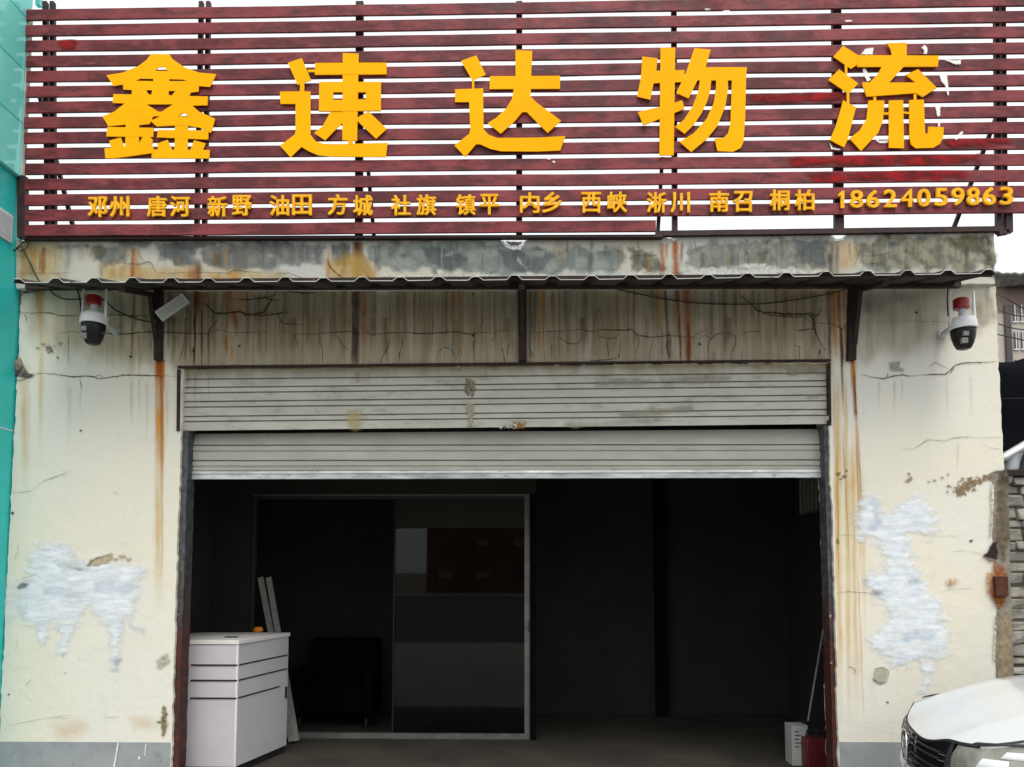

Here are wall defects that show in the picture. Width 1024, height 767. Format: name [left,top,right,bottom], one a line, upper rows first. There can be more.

rust [354,242,362,260]
water stain [60,240,665,277]
crack [15,261,999,388]
rust [665,290,691,360]
rust [828,290,857,415]
rust [156,361,164,463]
peeling [15,543,146,668]
peeling [854,493,949,693]
rust [989,564,1007,609]